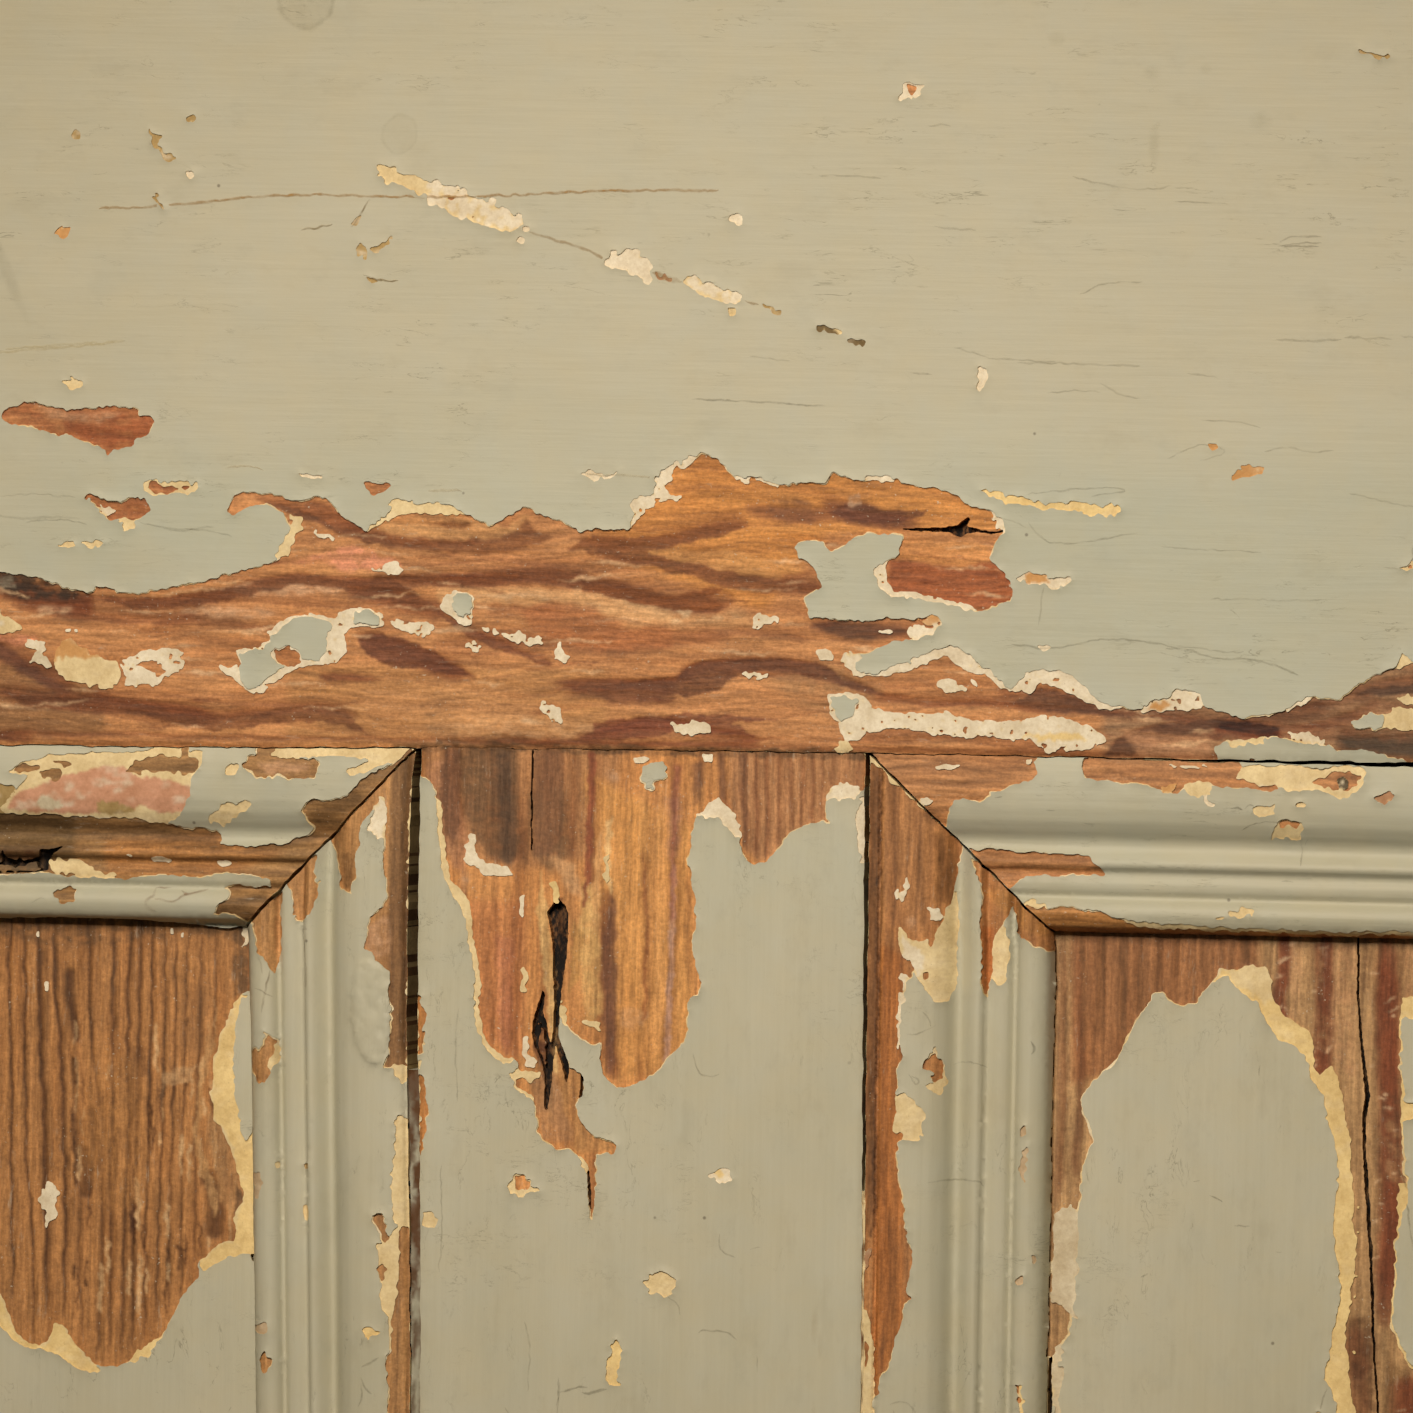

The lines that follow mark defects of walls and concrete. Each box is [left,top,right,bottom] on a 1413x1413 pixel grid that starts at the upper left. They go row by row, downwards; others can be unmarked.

peeling [729,213,743,226]
peeling [356,236,393,260]
peeling [62,376,83,390]
peeling [2,401,154,455]
peeling [0,452,1413,1413]